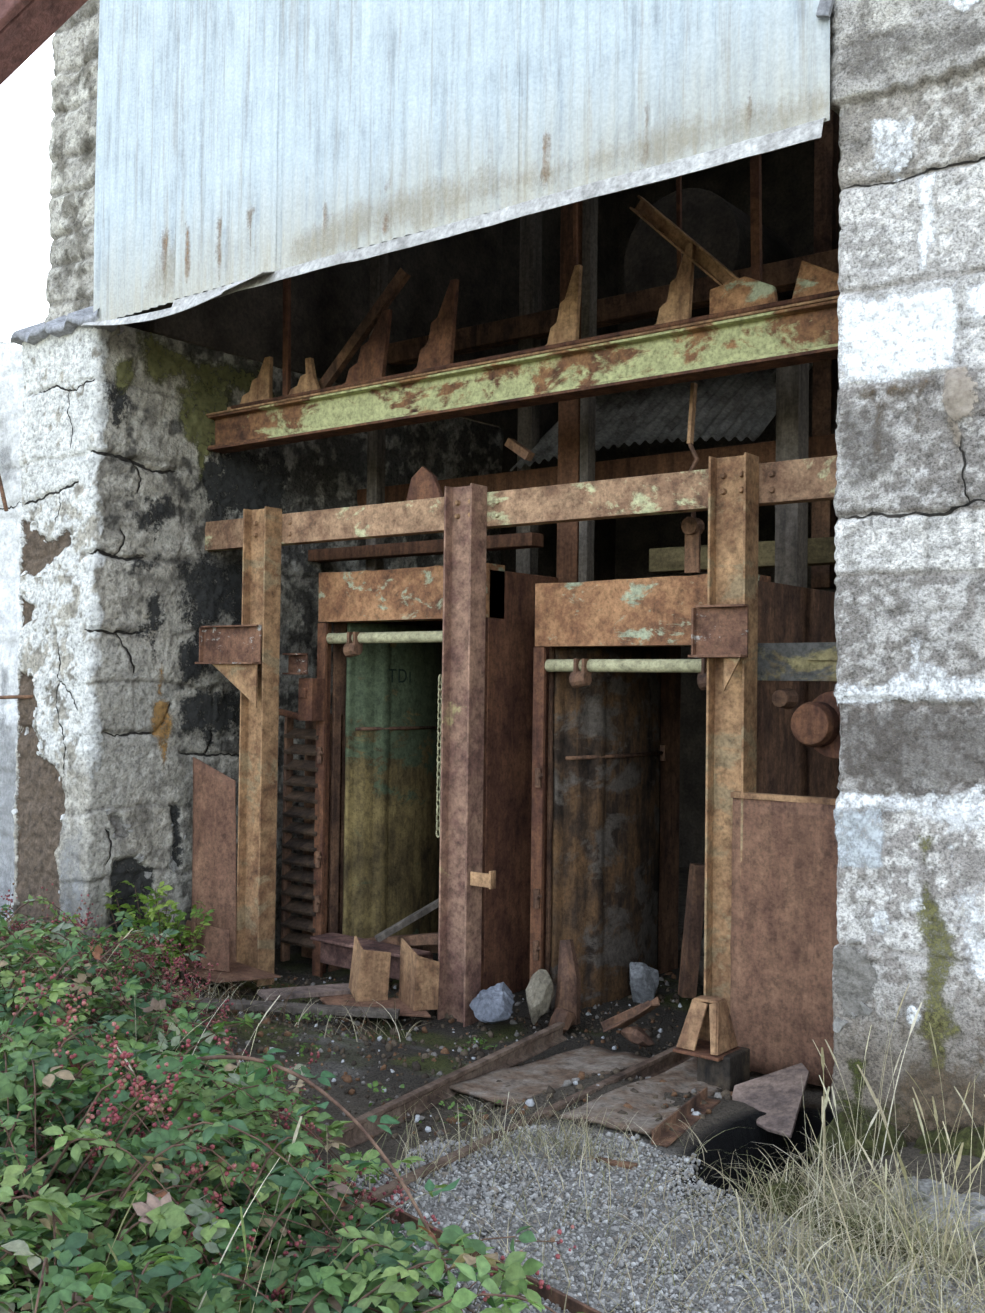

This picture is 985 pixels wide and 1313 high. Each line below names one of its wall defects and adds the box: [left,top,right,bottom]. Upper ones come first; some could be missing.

crack [0,379,175,522]
leakage [103,379,134,429]
leakage [193,443,290,521]
crack [840,414,985,519]
peeling [17,519,75,578]
crack [89,528,144,561]
spalling [18,594,38,627]
crack [56,629,138,772]
leakage [136,550,242,753]
spalling [11,669,66,928]
leakage [959,885,985,980]
leakage [879,1011,985,1143]